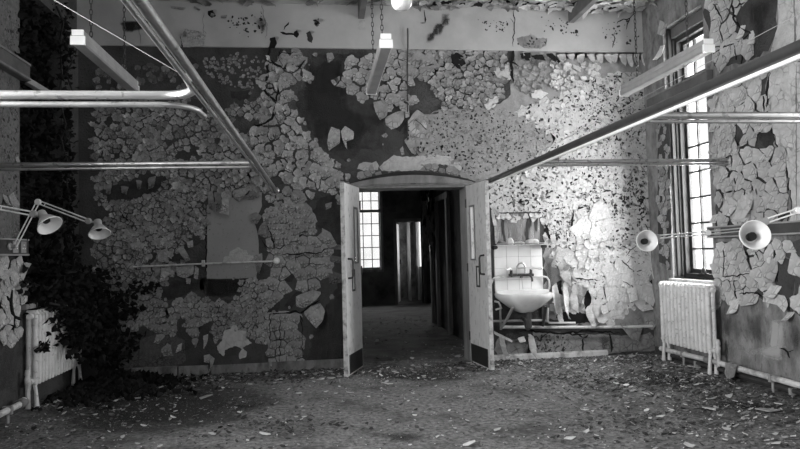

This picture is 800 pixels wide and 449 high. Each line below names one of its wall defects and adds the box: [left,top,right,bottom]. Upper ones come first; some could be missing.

crack [254,8,305,137]
crack [713,0,751,64]
peeling [703,0,800,73]
peeling [707,54,800,226]
peeling [88,0,672,373]
peeling [0,256,31,348]
peeling [710,238,800,320]